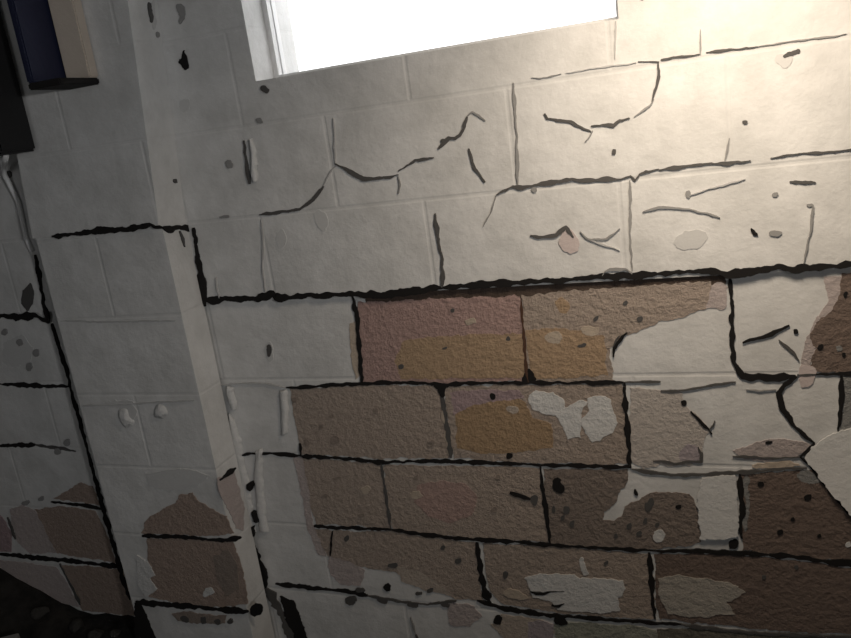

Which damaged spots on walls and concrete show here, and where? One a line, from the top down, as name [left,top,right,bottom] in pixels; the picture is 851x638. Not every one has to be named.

crack [0,255,249,614]
peeling [141,471,263,617]
crack [52,83,851,626]
spalling [290,273,851,638]